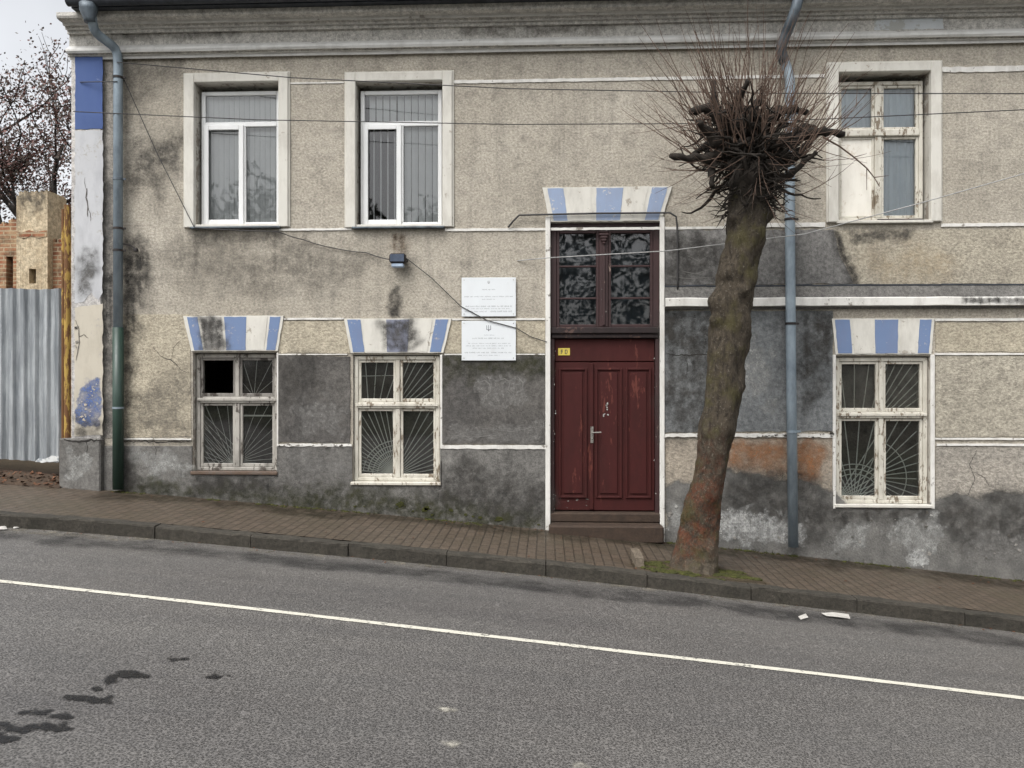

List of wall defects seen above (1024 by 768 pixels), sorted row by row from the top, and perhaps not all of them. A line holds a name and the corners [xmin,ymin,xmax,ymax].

damp [79,183,147,333]
damp [383,309,416,351]
peeling [75,378,102,426]
damp [77,396,112,435]
damp [865,491,1024,549]